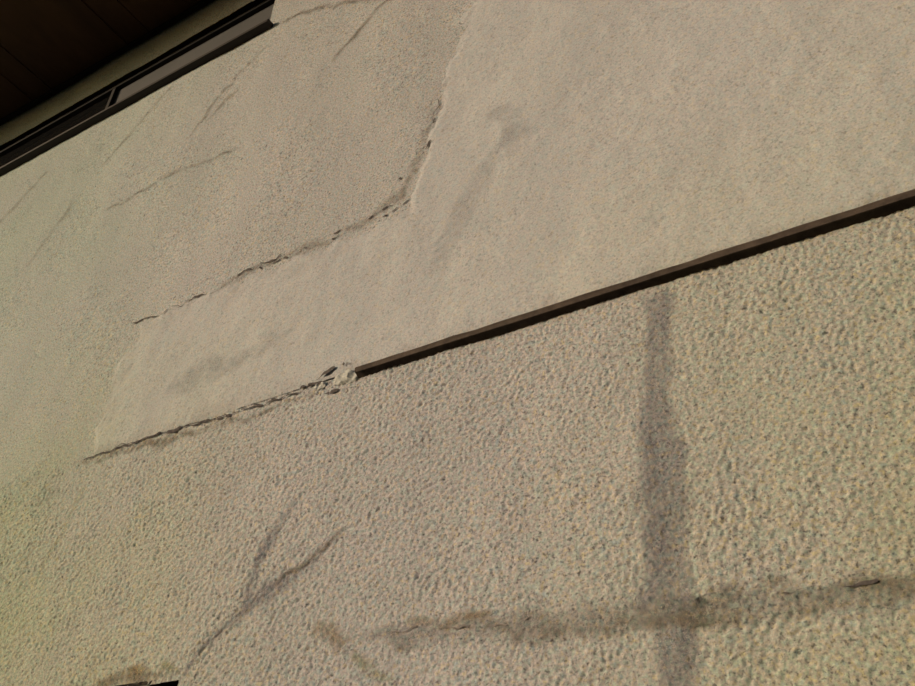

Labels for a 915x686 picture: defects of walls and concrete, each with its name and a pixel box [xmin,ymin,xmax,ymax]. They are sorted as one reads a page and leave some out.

crack [133,95,442,324]
crack [84,380,326,461]
water stain [638,297,739,683]
crack [183,543,328,673]
water stain [824,579,902,588]